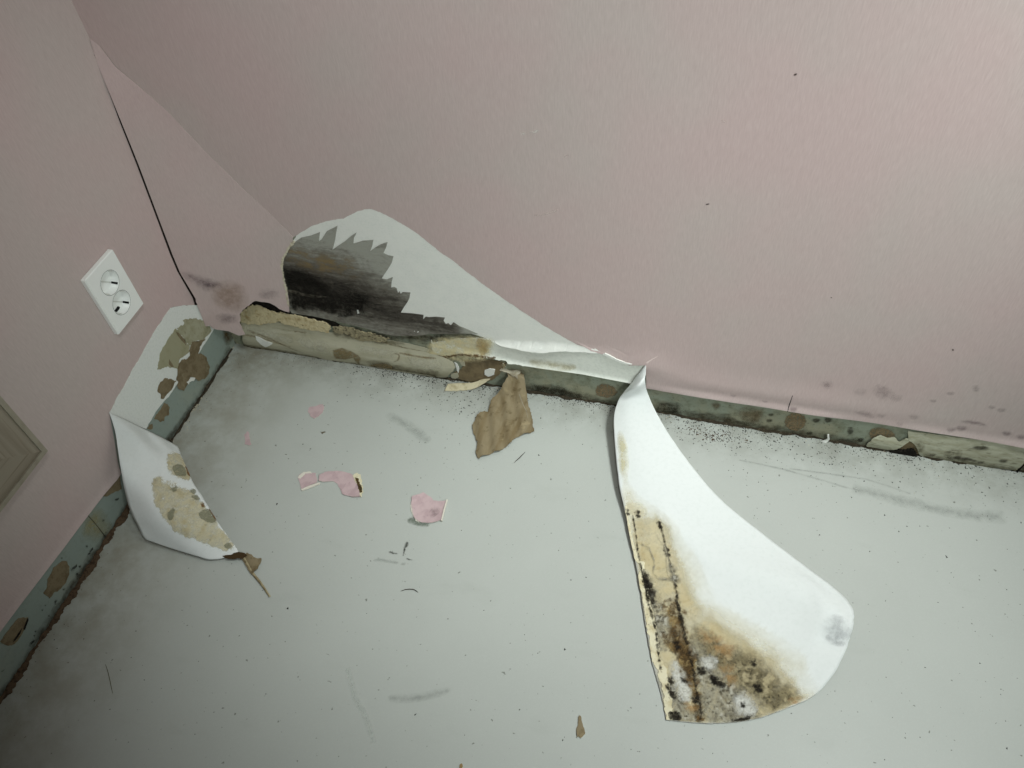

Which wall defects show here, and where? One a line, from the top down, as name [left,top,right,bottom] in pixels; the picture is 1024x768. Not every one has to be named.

damp [224,226,477,378]
peeling [109,412,271,597]
peeling [614,365,854,724]